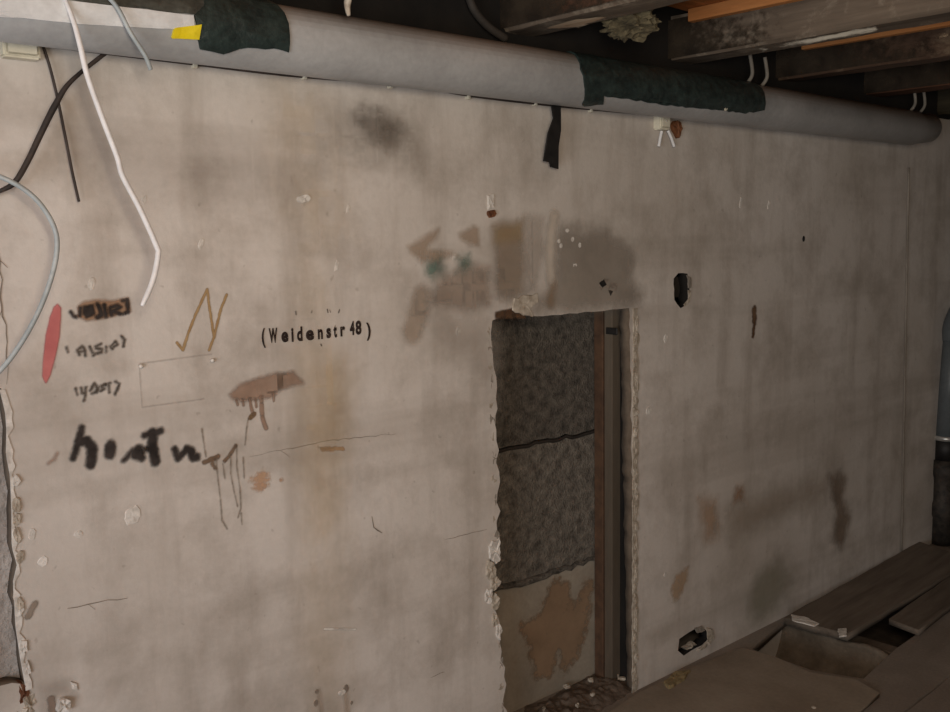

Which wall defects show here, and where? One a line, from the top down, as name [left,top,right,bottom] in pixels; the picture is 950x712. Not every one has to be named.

flaking render [0,389,77,712]
flaking render [485,538,503,640]